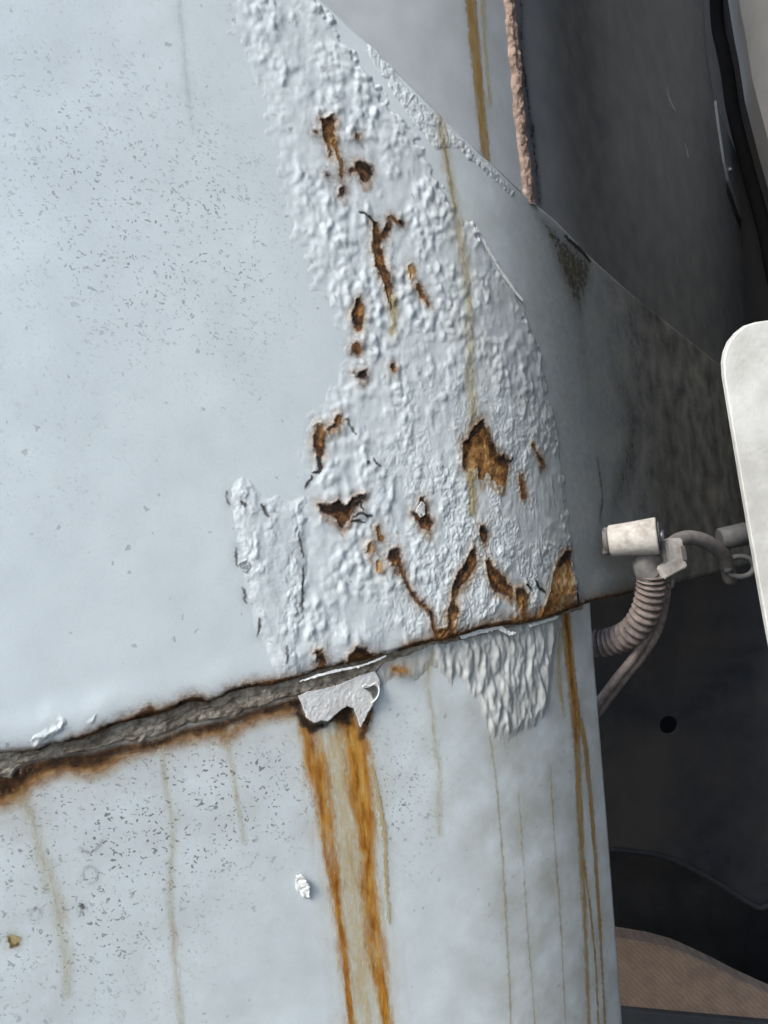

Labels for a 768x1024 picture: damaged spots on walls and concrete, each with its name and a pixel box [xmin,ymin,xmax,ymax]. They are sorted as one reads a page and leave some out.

corrosion [314,114,374,197]
corrosion [360,212,405,334]
corrosion [351,297,364,357]
corrosion [353,369,368,386]
corrosion [305,414,342,488]
corrosion [317,493,384,574]
corrosion [410,497,434,535]
corrosion [462,419,513,544]
peeling [459,626,517,639]
peeling [298,655,386,727]
corrosion [0,550,633,1024]
peeling [296,874,310,898]